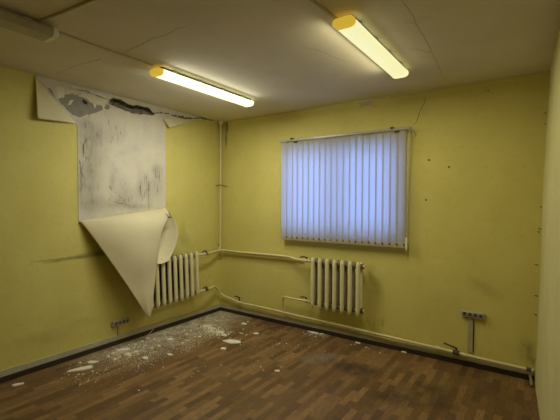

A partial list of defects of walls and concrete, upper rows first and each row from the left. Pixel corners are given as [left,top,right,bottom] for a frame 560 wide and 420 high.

flaking render [36,76,218,222]
crack [154,111,228,123]